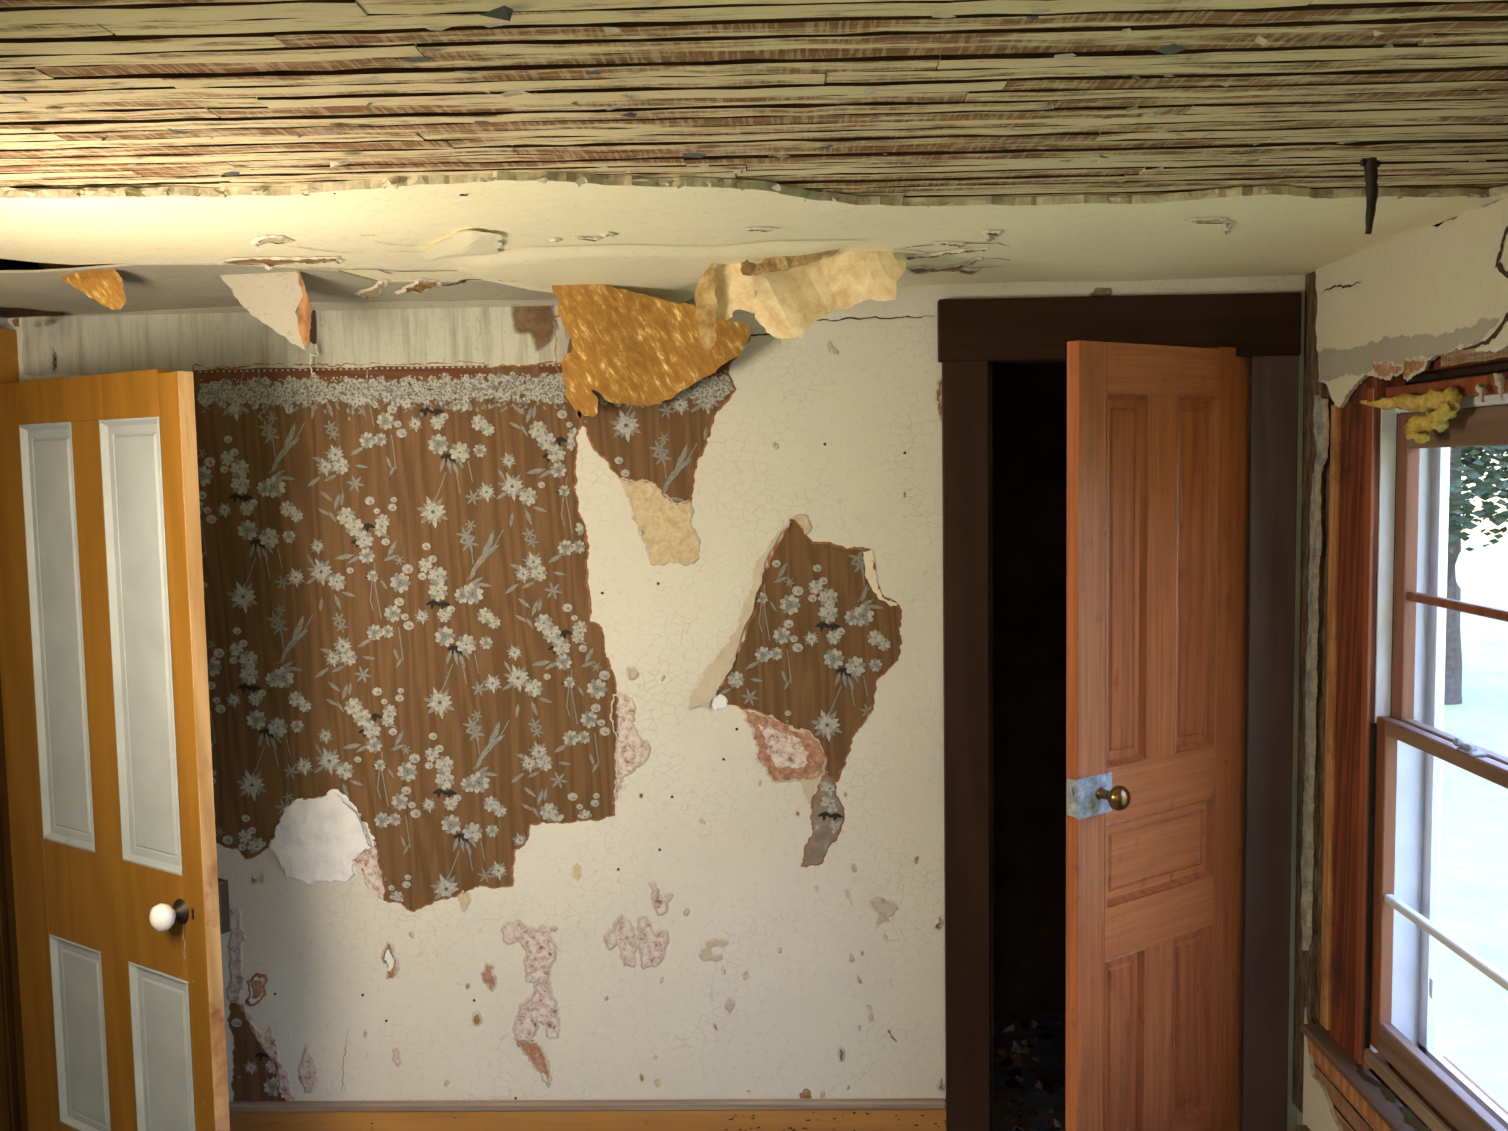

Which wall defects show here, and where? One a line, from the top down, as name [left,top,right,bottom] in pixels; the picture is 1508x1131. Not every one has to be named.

crack [1463,226,1508,350]
peeling [619,477,701,566]
flaking render [610,692,651,801]
flaking render [742,709,827,805]
flaking render [269,789,376,885]
peeling [457,890,471,913]
flaking render [603,881,674,970]
flaking render [845,889,899,925]
flaking render [500,919,561,1088]